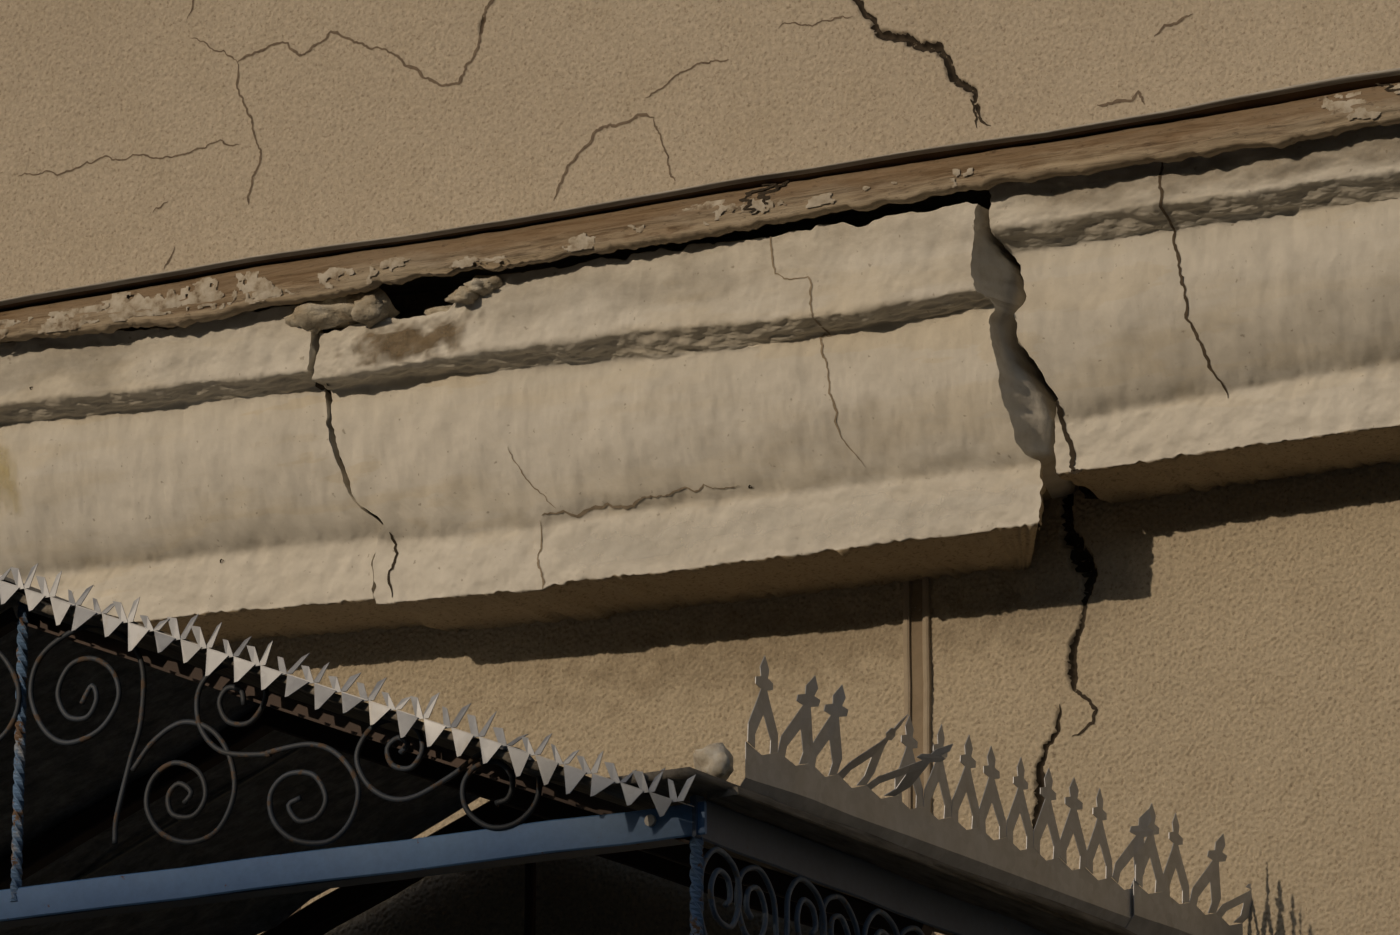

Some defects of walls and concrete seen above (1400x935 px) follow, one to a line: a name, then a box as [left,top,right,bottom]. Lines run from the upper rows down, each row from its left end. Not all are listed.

crack [19,0,494,205]
crack [553,59,729,201]
crack [778,0,991,128]
peeling [0,257,409,340]
crack [315,382,332,395]
spalling [424,255,506,315]
peeling [562,233,596,252]
crack [739,179,864,465]
crack [1158,162,1228,396]
crack [366,509,398,597]
crack [508,449,737,589]
crack [1032,400,1099,831]